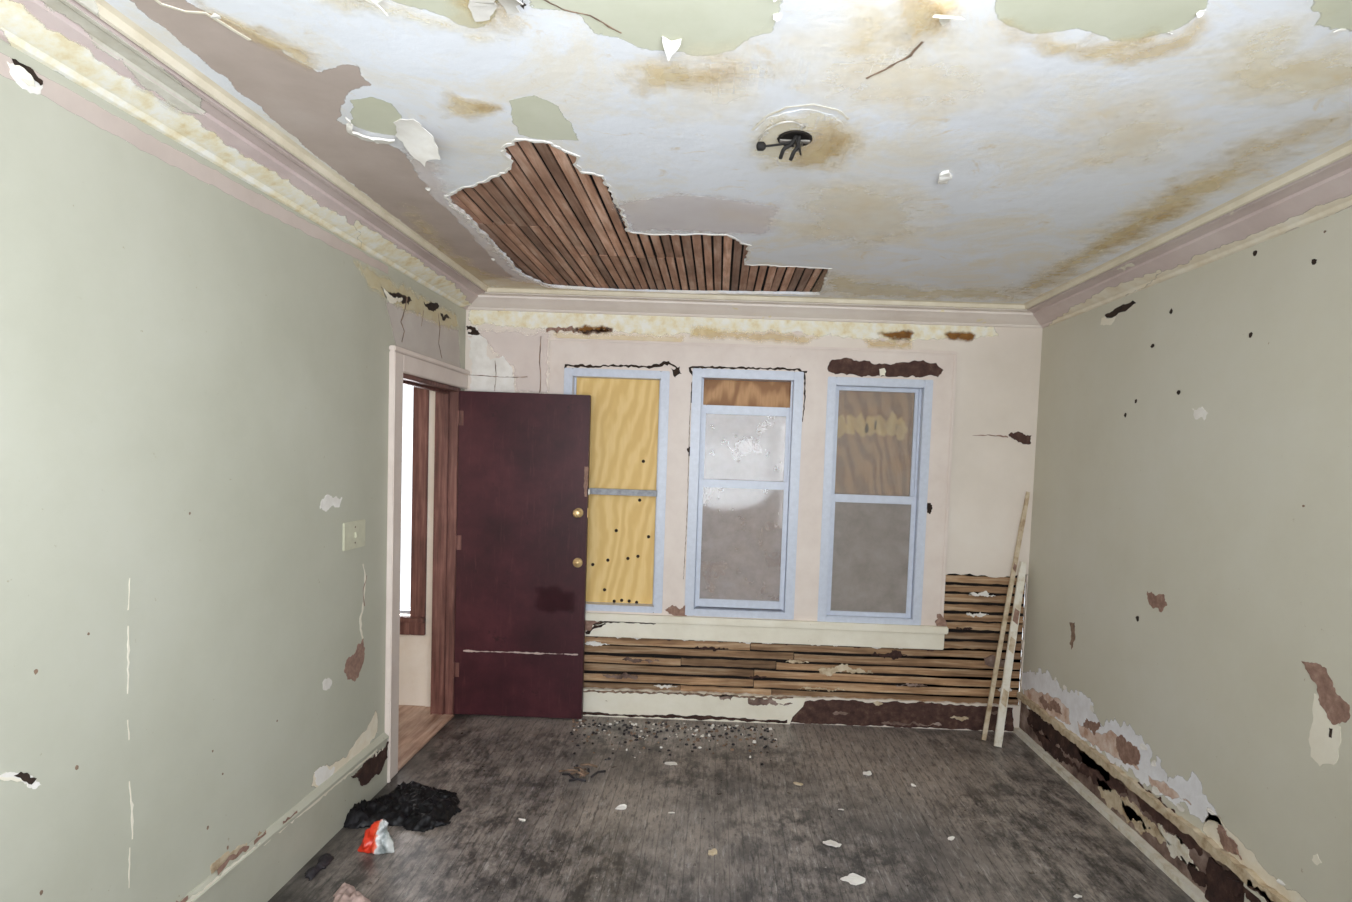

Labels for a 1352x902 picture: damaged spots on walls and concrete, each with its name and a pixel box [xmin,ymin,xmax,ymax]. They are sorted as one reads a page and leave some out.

peeling [995,0,1207,41]
peeling [1311,0,1352,33]
peeling [0,0,998,393]
peeling [322,564,367,690]
spalling [666,605,687,616]
spalling [935,614,947,626]
spalling [583,694,792,723]
peeling [882,716,968,726]
peeling [1301,661,1351,766]
peeling [311,711,389,788]
spalling [0,772,41,789]
peeling [985,668,1307,902]